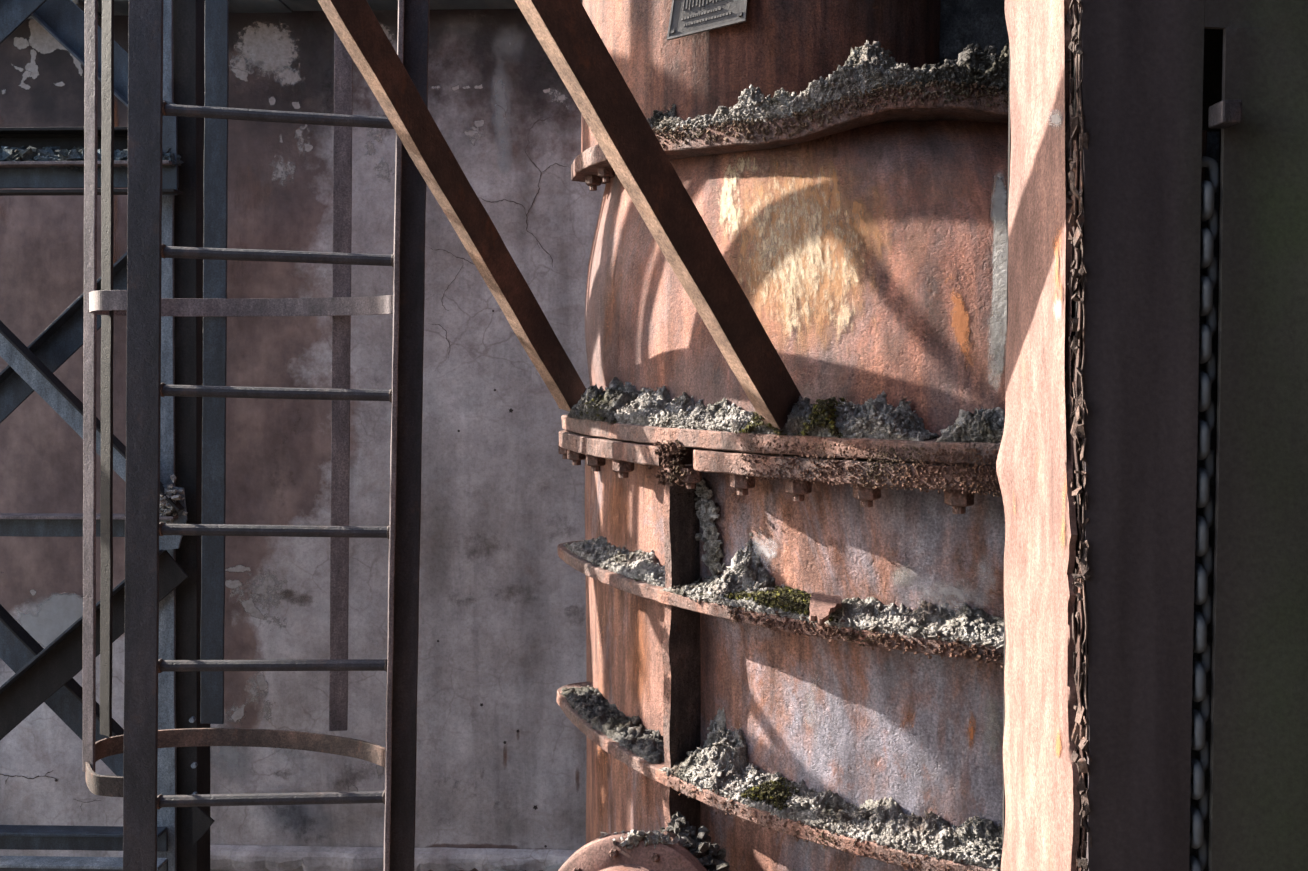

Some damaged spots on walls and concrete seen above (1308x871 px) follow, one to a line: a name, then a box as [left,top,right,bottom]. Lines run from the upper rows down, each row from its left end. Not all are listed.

peeling [2,19,83,94]
peeling [229,21,305,105]
peeling [272,124,313,185]
crack [481,83,567,267]
crack [428,247,475,358]
corrosion [947,276,971,364]